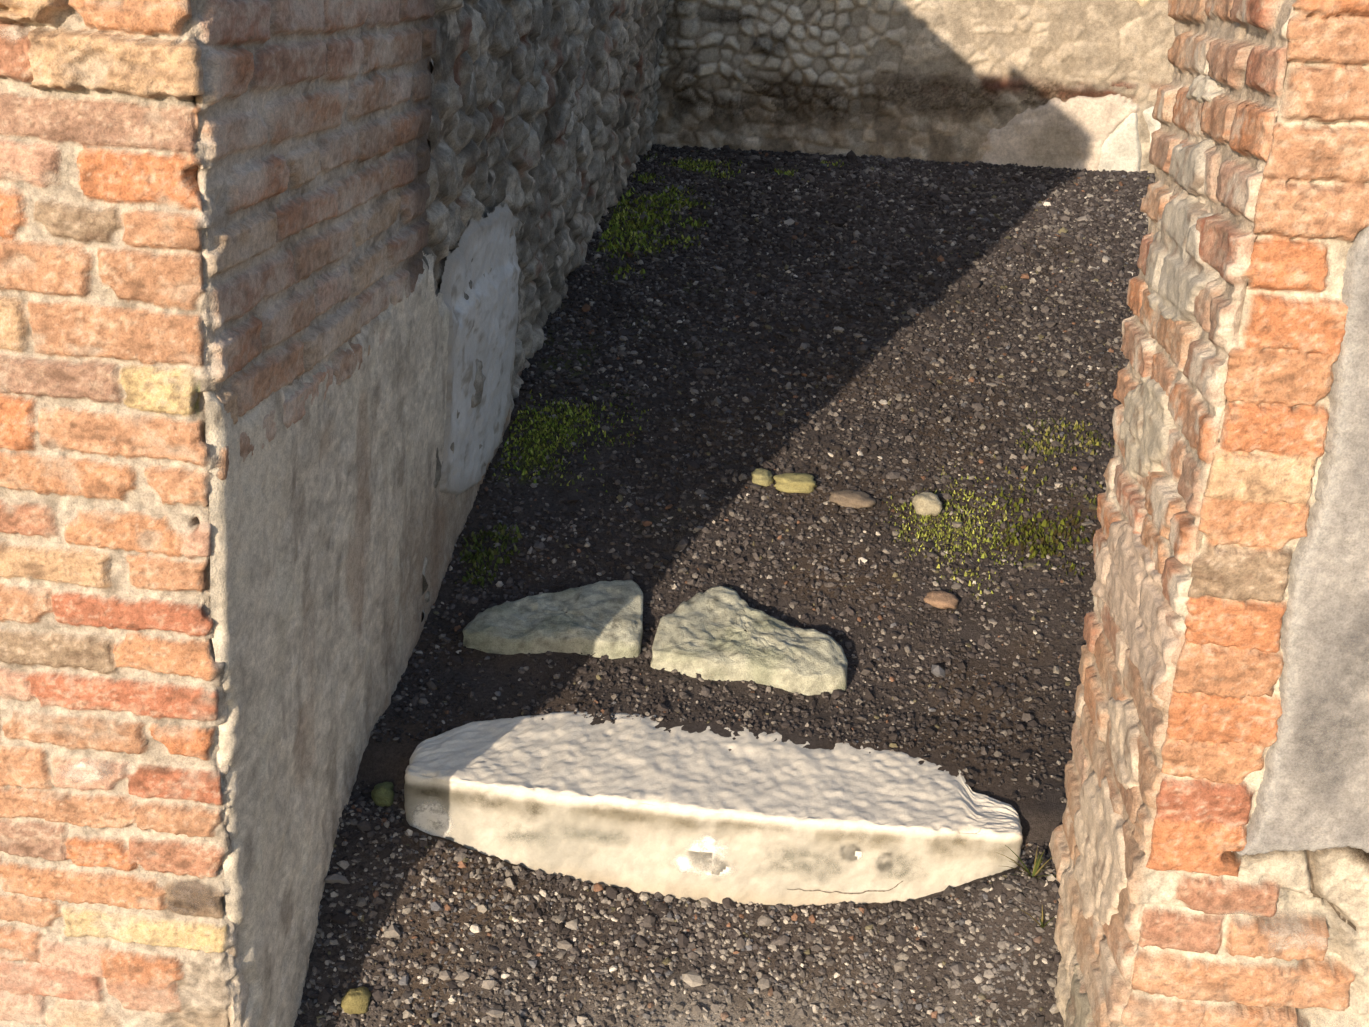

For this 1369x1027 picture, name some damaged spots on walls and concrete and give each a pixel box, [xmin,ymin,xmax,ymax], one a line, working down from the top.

spalling [1317,847,1369,864]